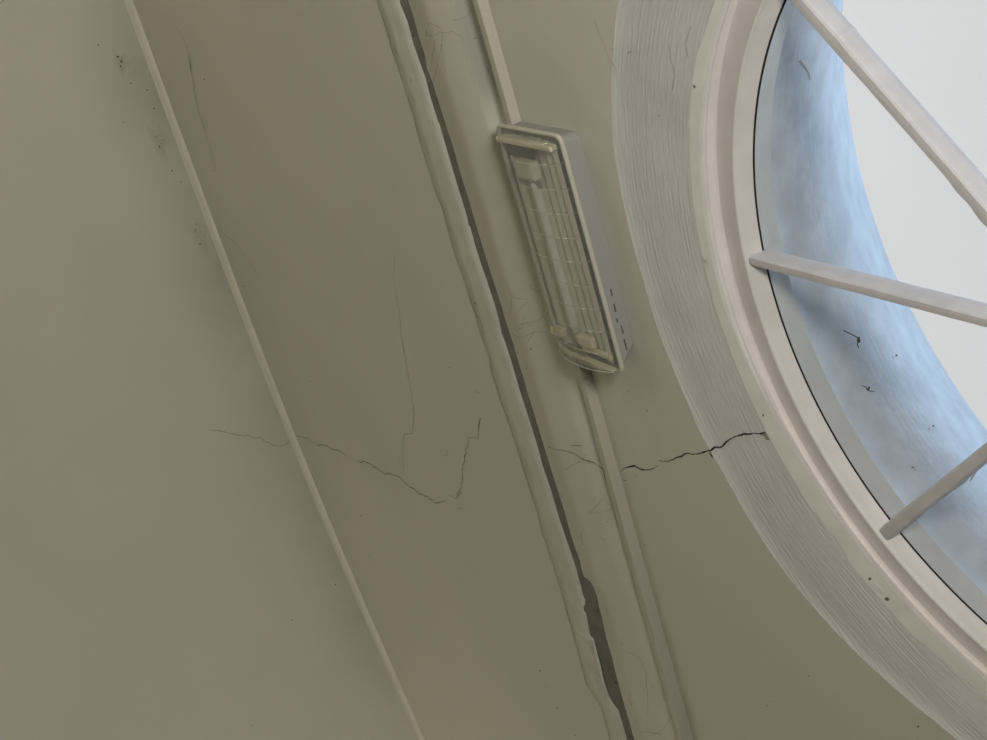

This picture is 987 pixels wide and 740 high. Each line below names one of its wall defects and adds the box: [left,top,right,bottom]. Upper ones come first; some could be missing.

crack [212,257,481,509]
crack [550,432,766,481]